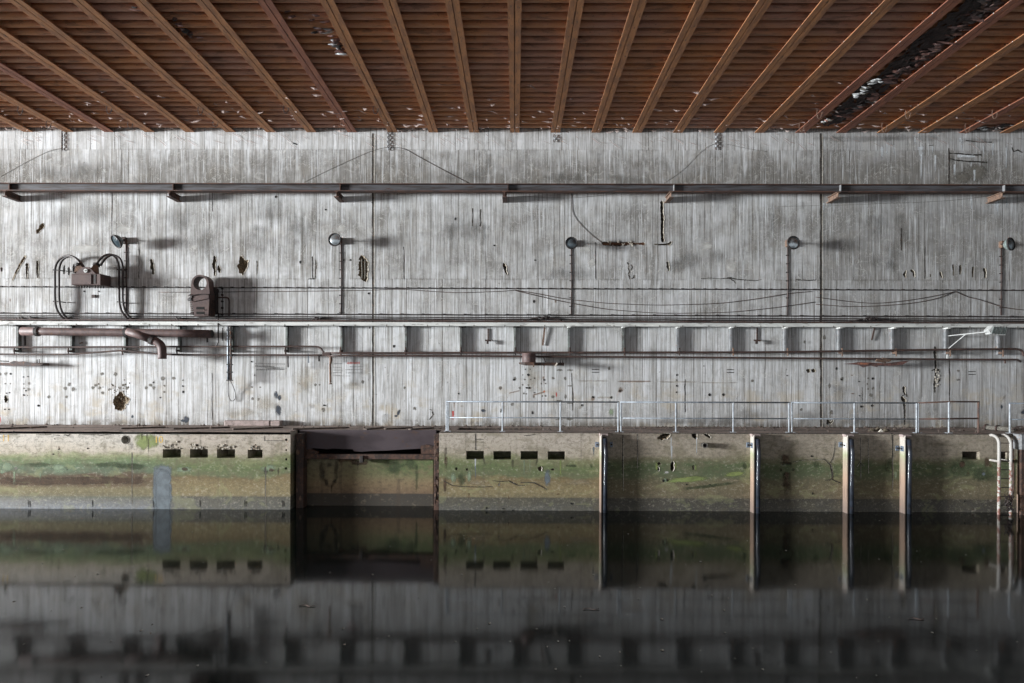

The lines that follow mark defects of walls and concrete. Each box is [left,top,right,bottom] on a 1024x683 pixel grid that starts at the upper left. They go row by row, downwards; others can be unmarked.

peeling [853,78,883,98]
spalling [237,255,249,275]
spalling [343,255,371,294]
spalling [91,372,130,411]
damp [655,438,746,489]
damp [0,462,190,509]